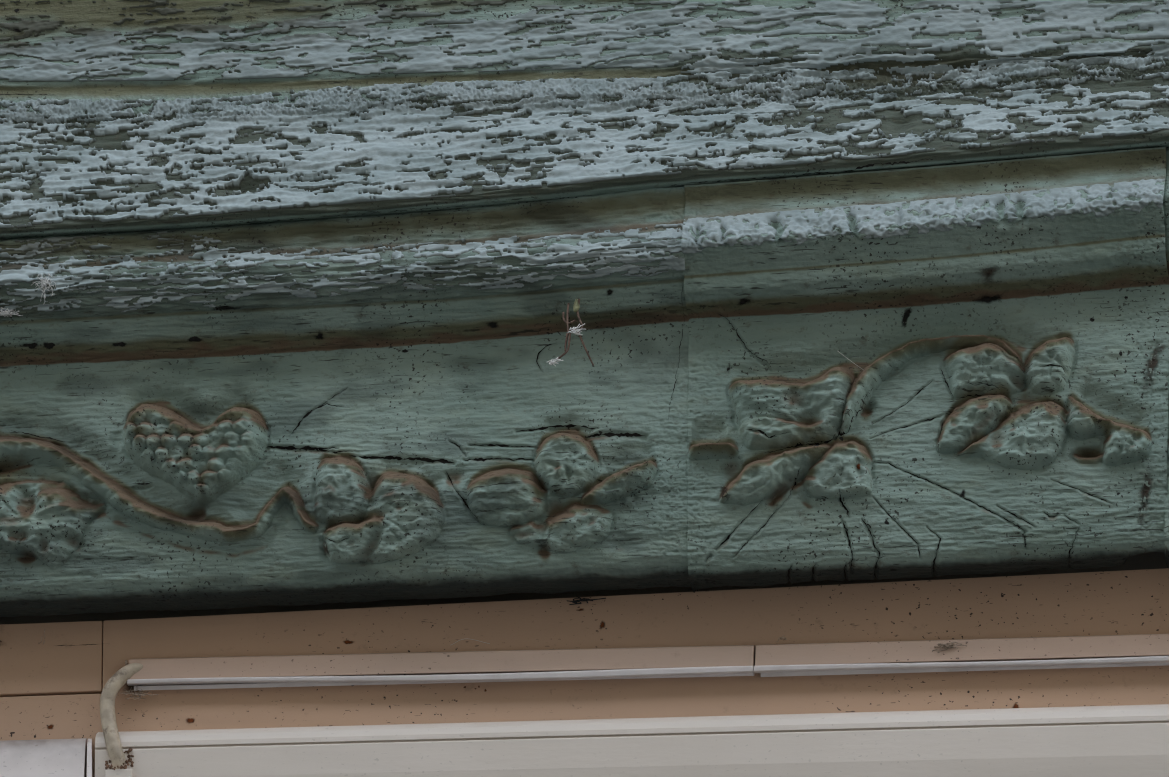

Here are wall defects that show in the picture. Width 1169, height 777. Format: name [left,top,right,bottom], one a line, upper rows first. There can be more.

peeling [0,0,1169,313]
crack [268,388,644,525]
crack [839,489,941,579]
crack [706,370,1077,564]